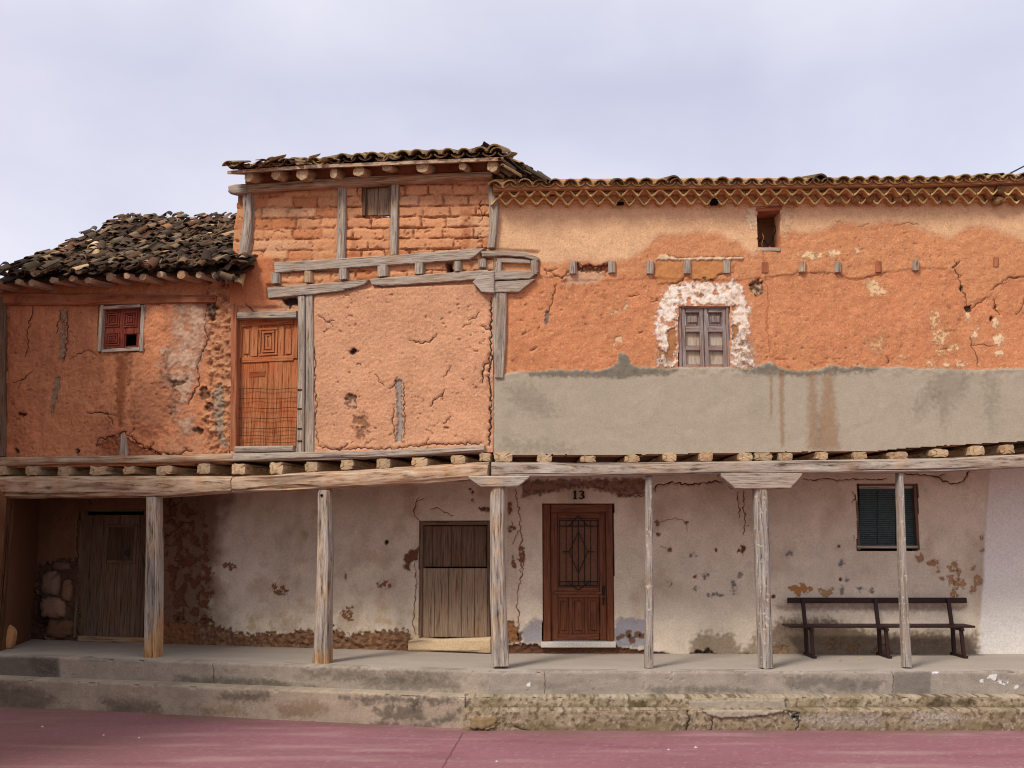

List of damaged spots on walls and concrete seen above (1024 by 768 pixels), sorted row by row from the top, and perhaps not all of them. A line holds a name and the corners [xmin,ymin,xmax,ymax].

crack [630,233,884,354]
crack [952,262,1024,315]
peeling [654,279,760,370]
peeling [157,303,229,447]
crack [314,286,493,451]
crack [90,411,192,455]
flaking render [507,477,645,533]
crack [593,480,749,534]
crack [803,471,970,501]
flaking render [163,498,314,648]
flaking render [333,606,412,651]
flaking render [507,621,666,654]